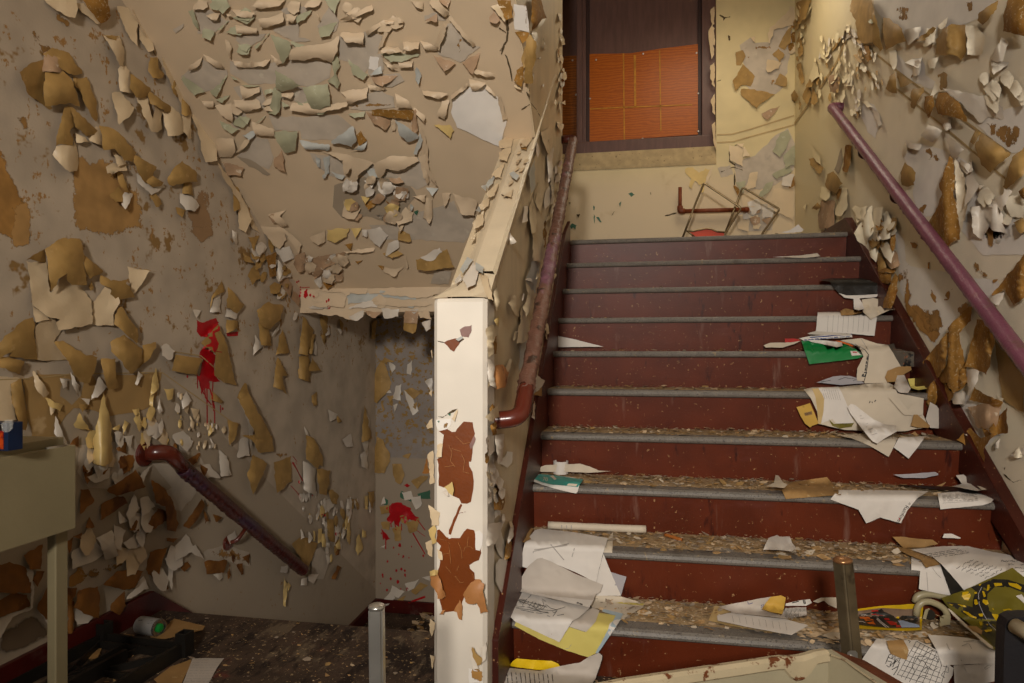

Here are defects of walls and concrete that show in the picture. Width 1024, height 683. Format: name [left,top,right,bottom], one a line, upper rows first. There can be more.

peeling [20,0,567,423]
peeling [733,0,1024,305]
peeling [0,238,962,652]
peeling [892,307,1024,462]
peeling [591,596,841,644]